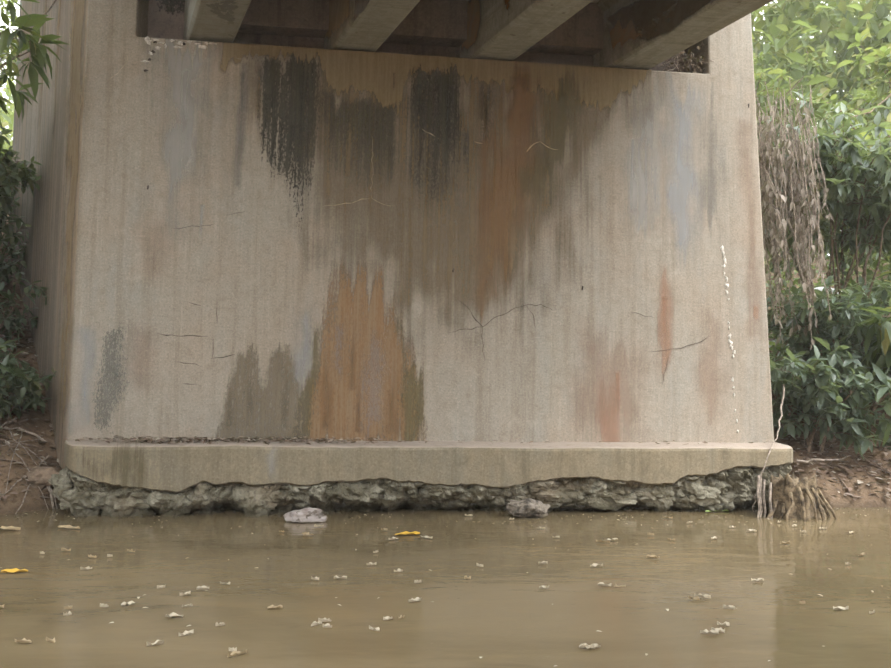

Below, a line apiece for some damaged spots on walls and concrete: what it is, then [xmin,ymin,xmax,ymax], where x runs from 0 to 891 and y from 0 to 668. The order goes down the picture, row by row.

damp [215,0,651,441]
rust [294,262,426,441]
crack [449,299,552,361]
rust [659,281,671,369]
spalling [48,463,792,518]